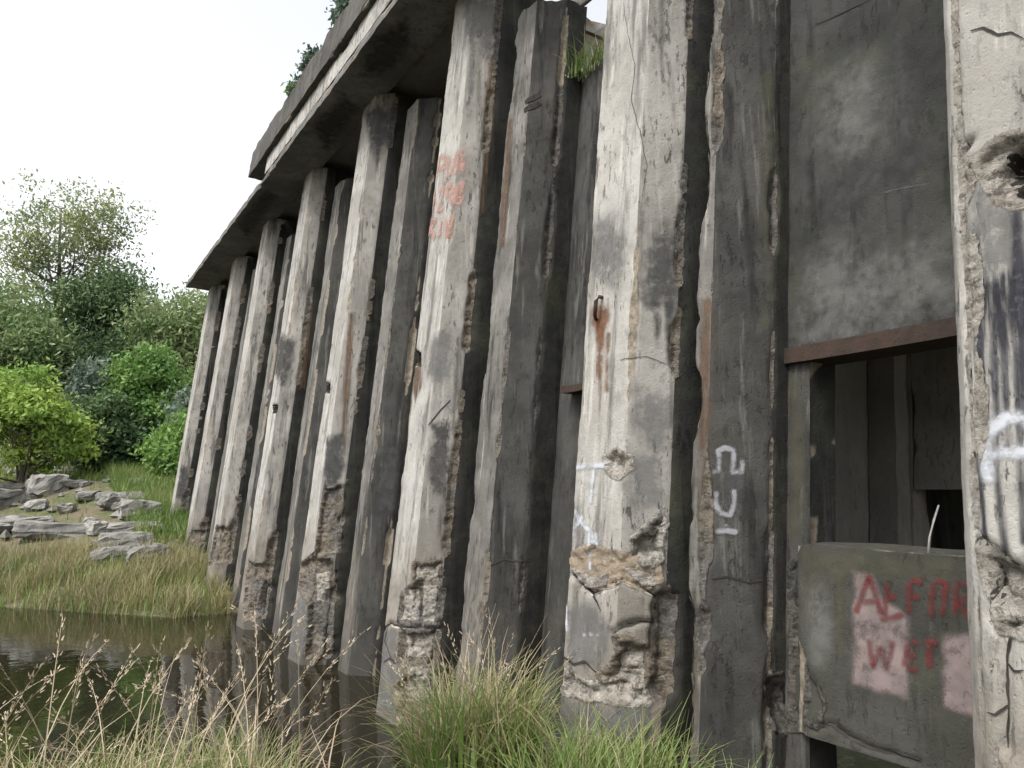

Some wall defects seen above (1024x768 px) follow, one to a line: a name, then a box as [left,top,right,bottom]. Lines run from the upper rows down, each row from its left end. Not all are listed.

crack [624,14,647,195]
crack [970,27,1024,39]
spalling [461,268,477,354]
corrosion [592,306,610,391]
damp [644,234,678,352]
spalling [674,163,689,288]
spalling [951,0,1024,642]
spalling [242,523,279,623]
spalling [298,478,349,660]
spalling [393,390,465,715]
peeling [560,409,714,768]
crack [980,533,1024,745]